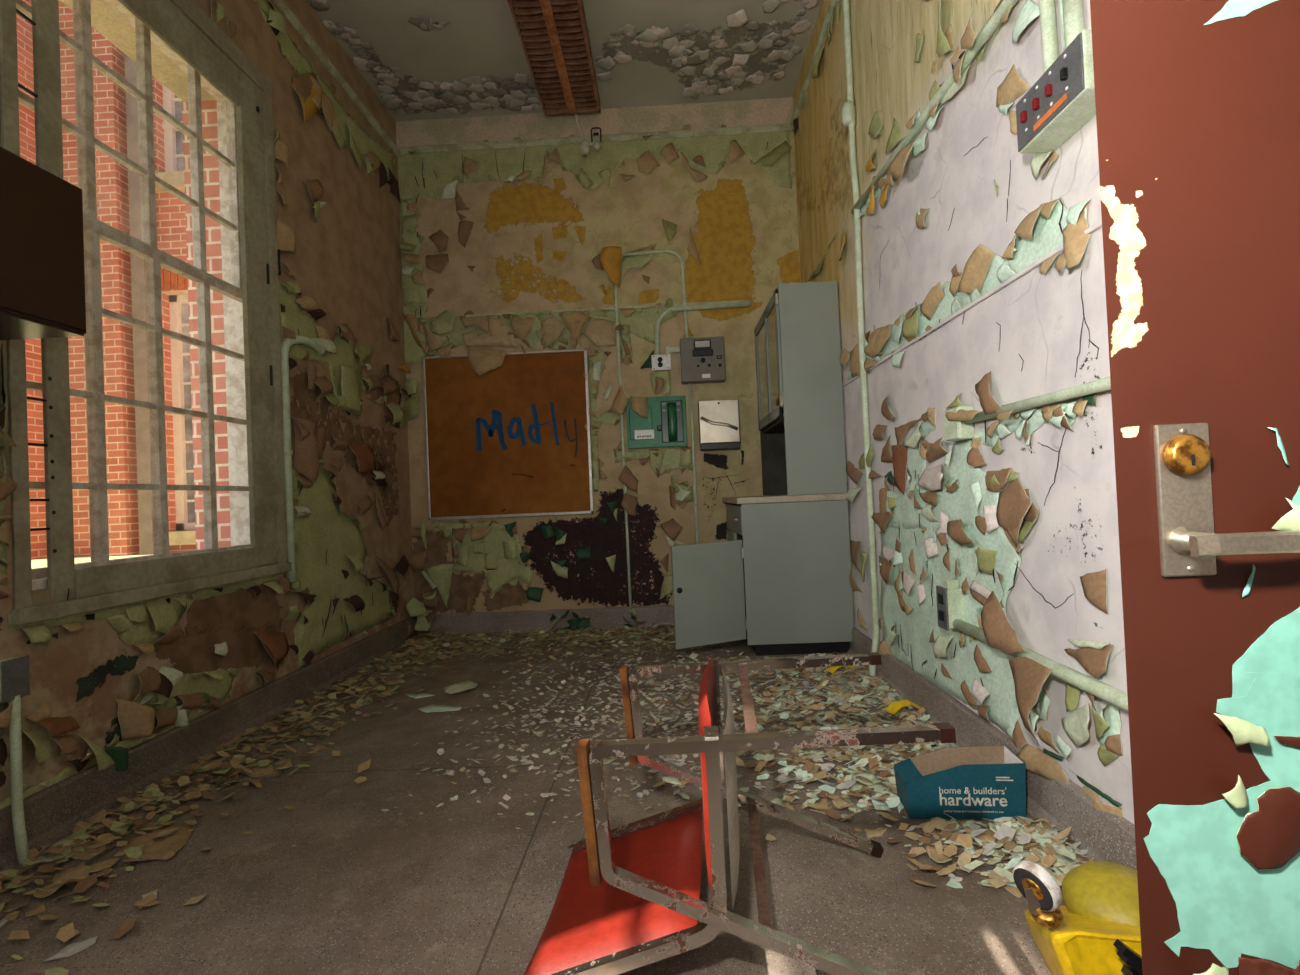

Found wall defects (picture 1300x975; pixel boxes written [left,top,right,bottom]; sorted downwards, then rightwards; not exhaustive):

peeling [1204,0,1277,25]
peeling [777,0,1040,283]
peeling [1030,150,1059,180]
peeling [840,185,1149,380]
peeling [0,0,840,809]
spalling [1121,426,1139,438]
peeling [1266,427,1290,467]
peeling [1271,485,1300,531]
peeling [846,371,1123,818]
peeling [1241,564,1256,598]
peeling [1143,607,1300,975]
peeling [928,818,1090,888]